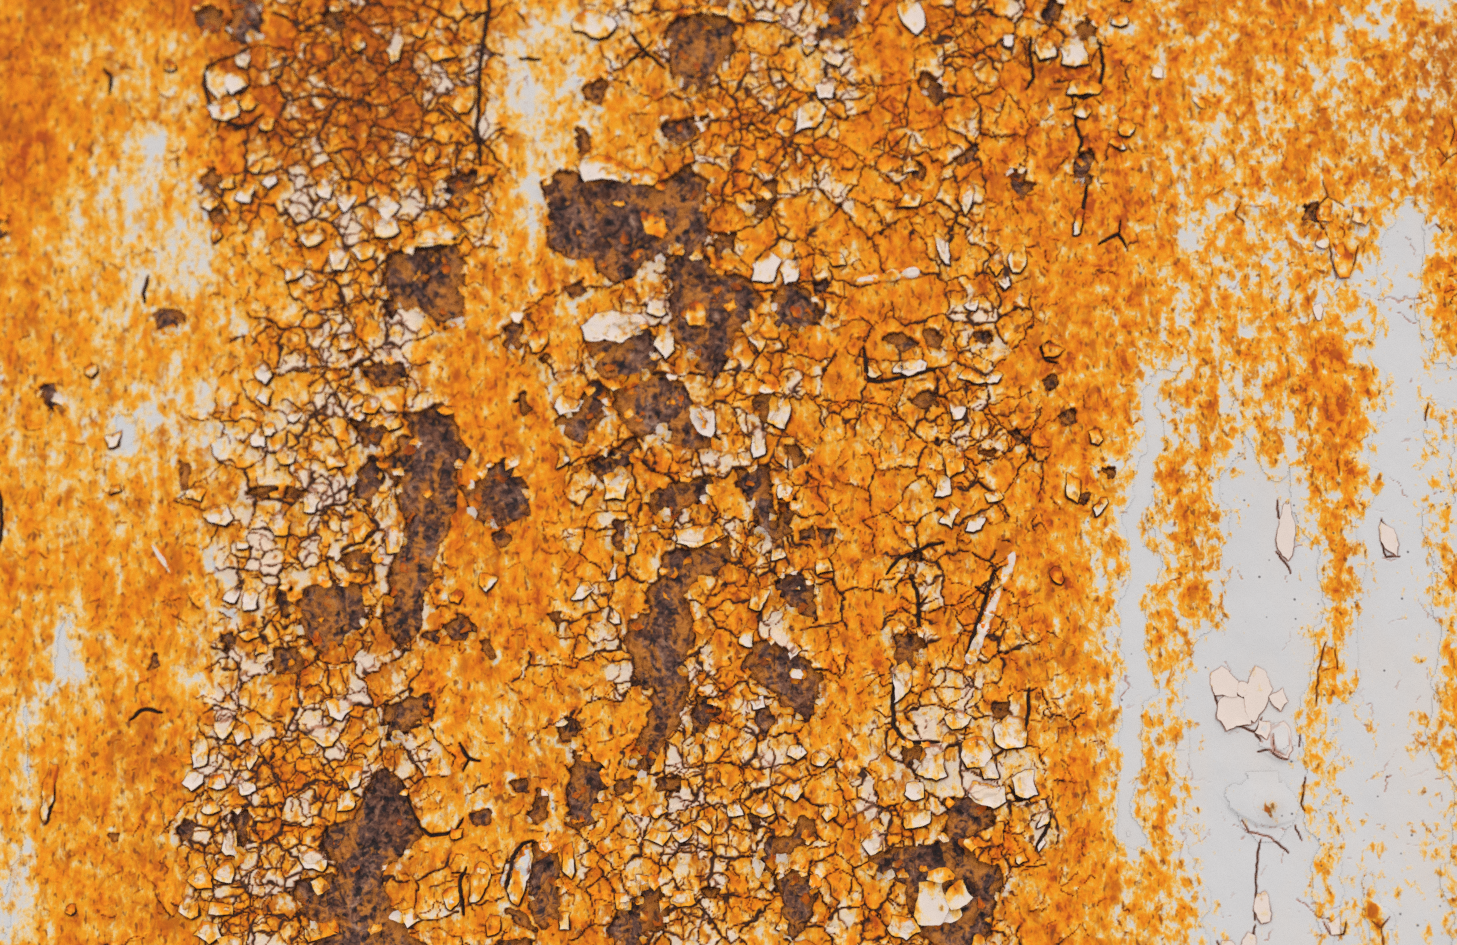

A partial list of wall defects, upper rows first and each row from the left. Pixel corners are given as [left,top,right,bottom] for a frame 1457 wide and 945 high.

rust [0,0,279,945]
crack [130,0,540,945]
peeling [294,769,427,945]
peeling [264,404,530,683]
rust [385,0,655,945]
peeling [486,537,731,945]
peeling [541,0,828,484]
crack [505,0,1126,945]
rust [817,445,888,731]
rust [879,0,912,65]
peeling [860,796,1003,945]
rust [990,0,1457,945]